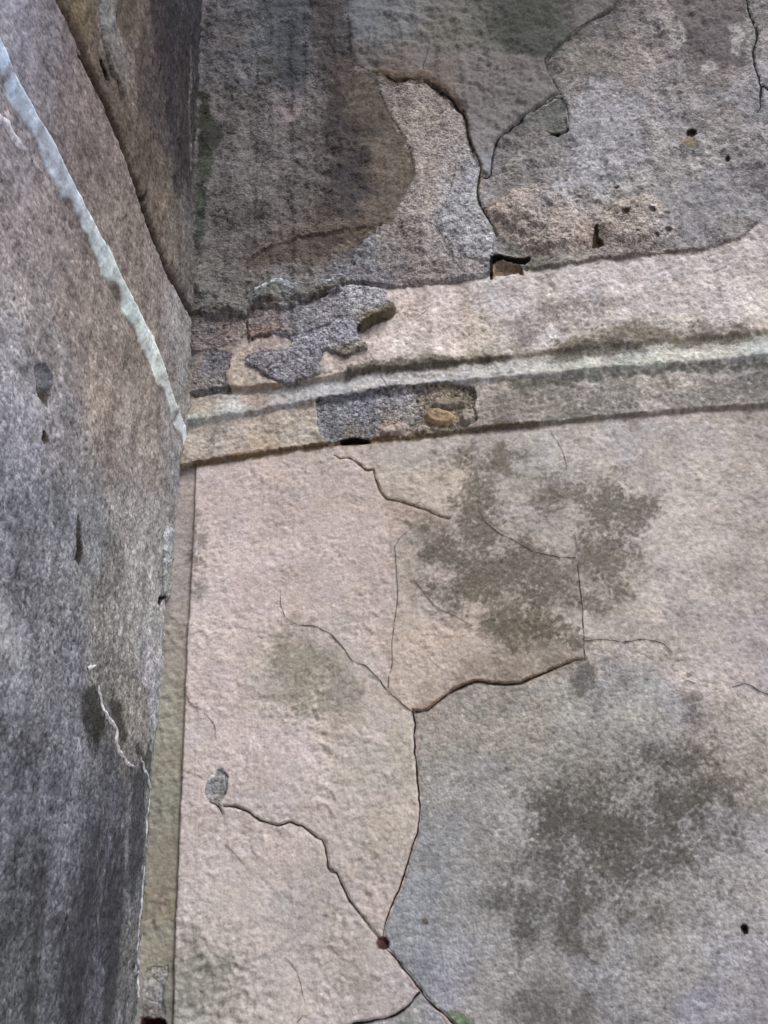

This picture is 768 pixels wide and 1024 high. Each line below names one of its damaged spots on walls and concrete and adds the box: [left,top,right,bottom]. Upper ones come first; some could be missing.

flaking render [191,0,619,398]
damp [194,443,348,467]
spalling [316,381,478,446]
damp [370,395,661,693]
crack [210,454,666,1024]
damp [486,742,744,954]